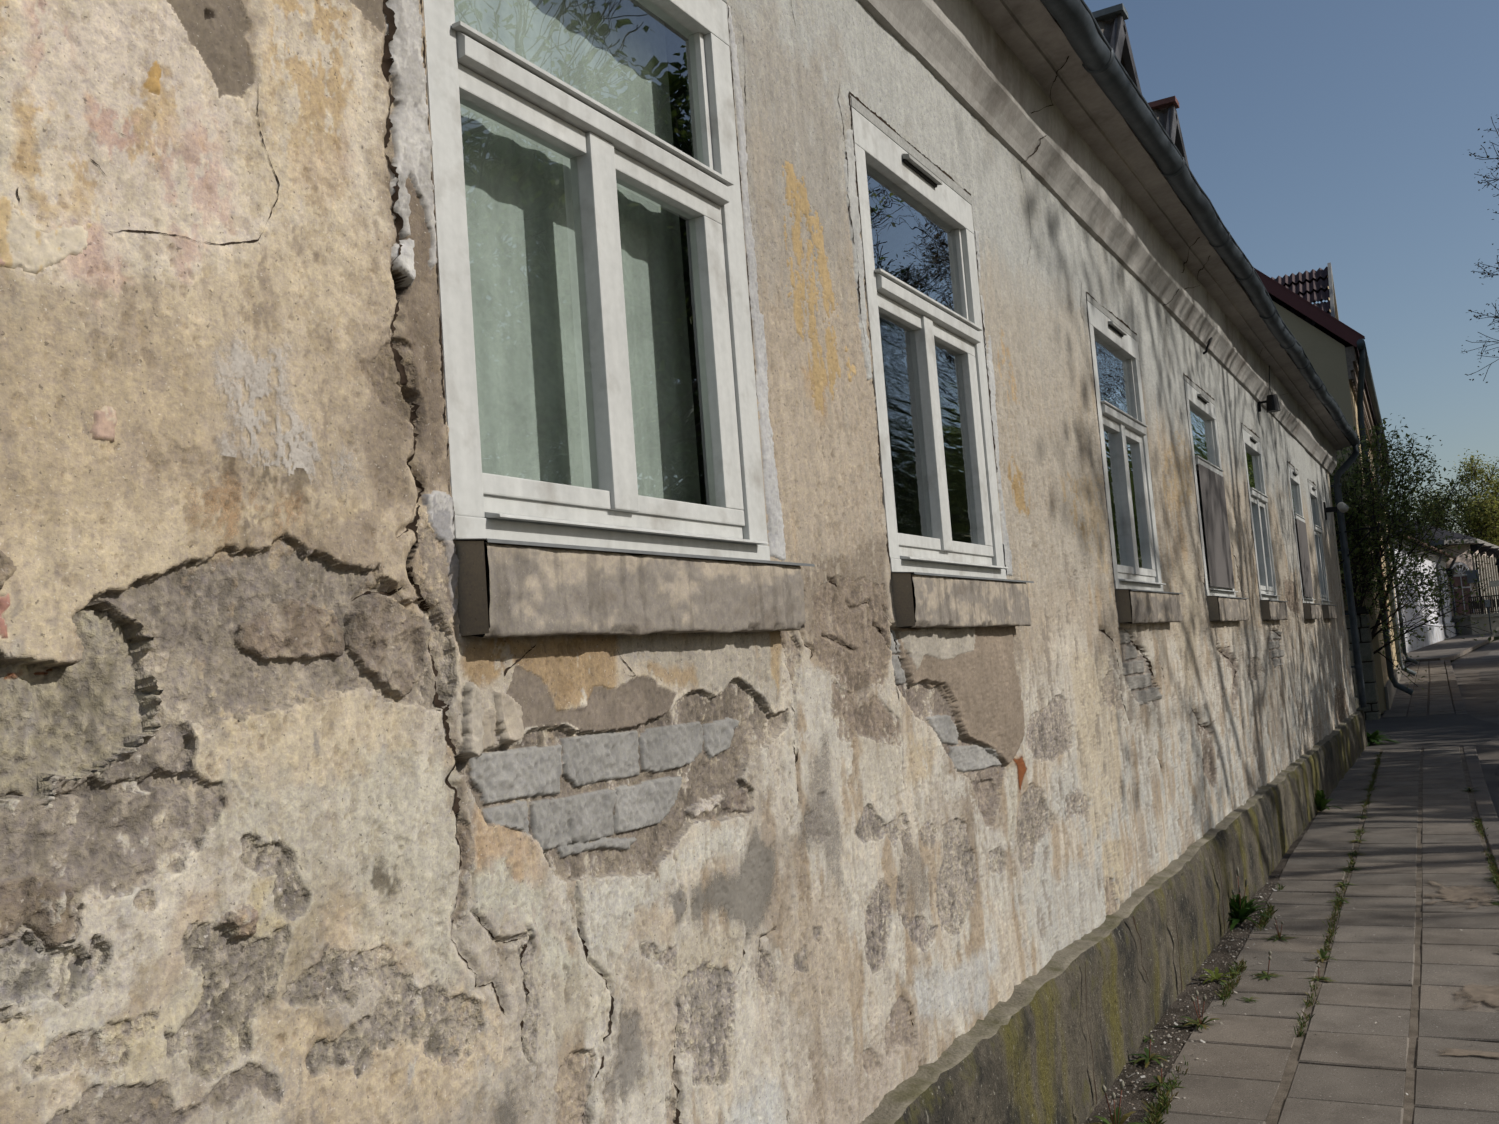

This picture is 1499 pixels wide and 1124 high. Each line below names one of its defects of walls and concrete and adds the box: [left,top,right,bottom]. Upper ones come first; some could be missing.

flaking render [166,0,255,99]
flaking render [351,0,386,33]
crack [119,80,280,245]
crack [352,0,530,1053]
flaking render [1098,627,1163,711]
spalling [1216,628,1285,713]
spalling [0,517,1090,1033]
spalling [21,833,485,1124]
spalling [503,930,539,1063]
spalling [553,1047,597,1124]
crack [672,1027,681,1124]
spalling [639,941,737,1087]